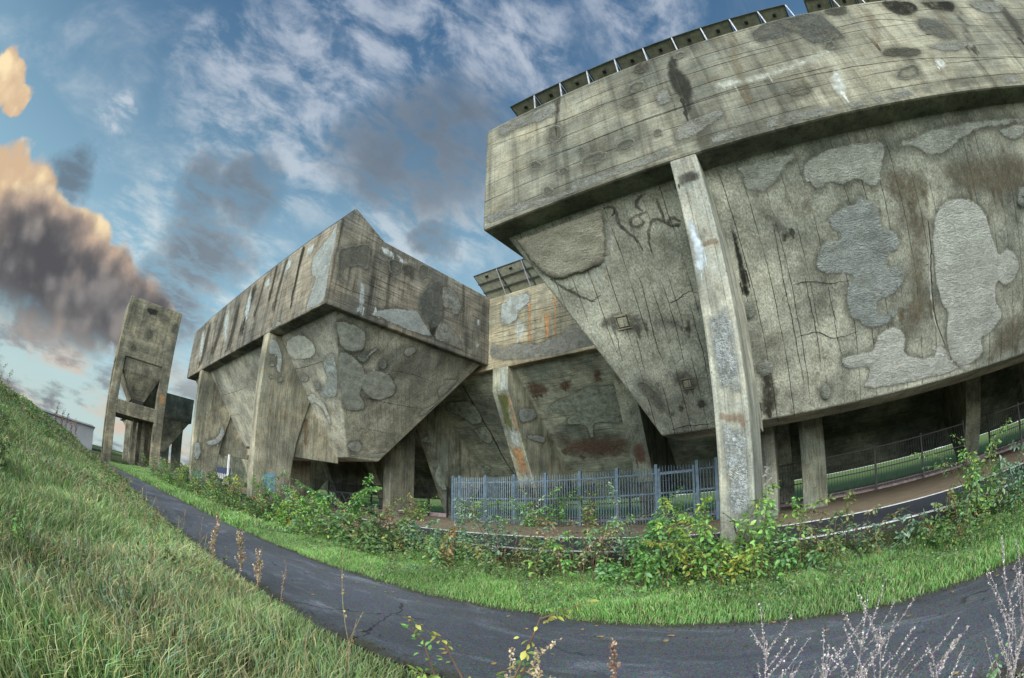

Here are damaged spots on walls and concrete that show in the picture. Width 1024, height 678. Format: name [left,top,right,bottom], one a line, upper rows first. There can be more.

water stain [668,58,691,120]
peeling [738,141,884,191]
peeling [307,224,370,308]
crack [603,206,643,251]
water stain [688,221,708,280]
water stain [732,232,750,301]
crack [774,231,858,380]
peeling [817,197,1019,388]
crack [926,220,945,346]
peeling [270,321,395,424]
corrosion [562,439,645,467]